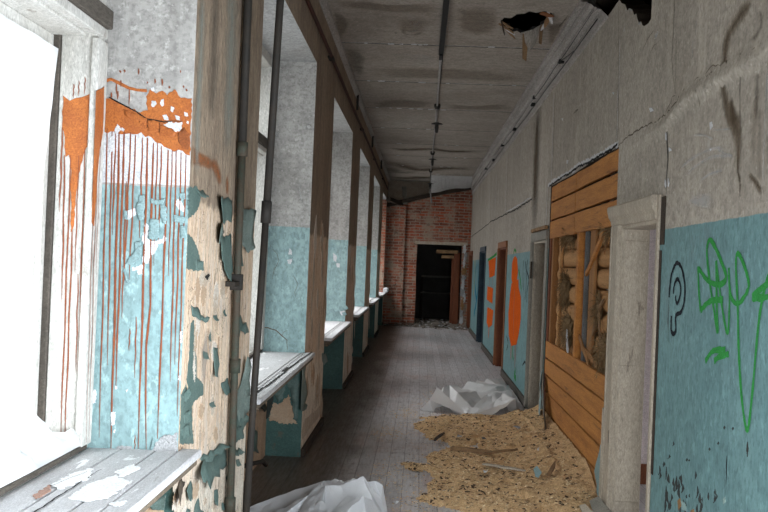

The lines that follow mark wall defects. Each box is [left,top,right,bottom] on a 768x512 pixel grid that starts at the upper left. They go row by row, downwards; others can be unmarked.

water stain [723,6,748,63]
peeling [109,124,125,153]
crack [109,97,182,126]
peeling [123,99,190,149]
crack [616,0,679,187]
water stain [721,86,741,186]
peeling [123,186,259,512]
peeling [261,215,356,442]
peeling [32,464,140,507]
peeling [658,442,726,512]